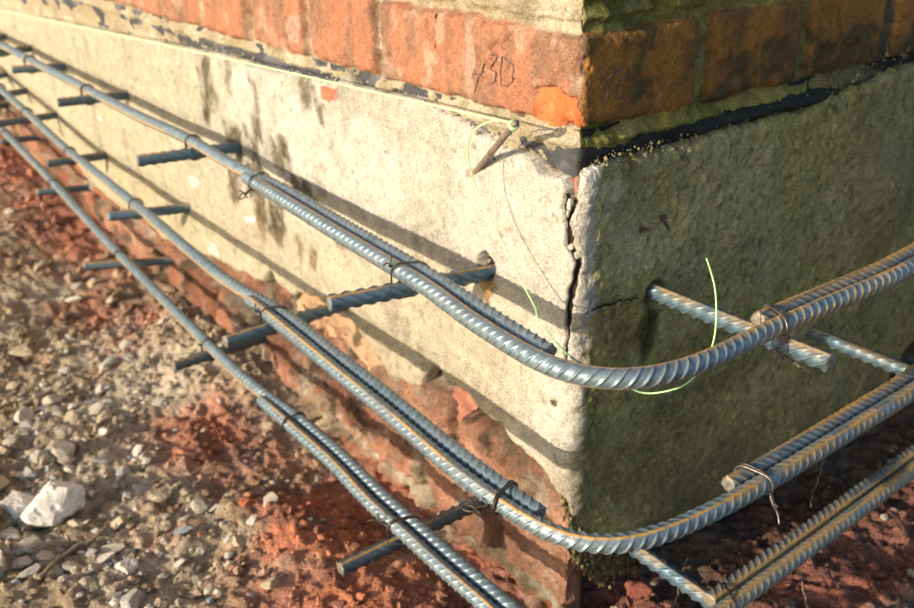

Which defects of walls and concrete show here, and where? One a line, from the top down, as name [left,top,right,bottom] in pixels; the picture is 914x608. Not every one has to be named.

damp [196,57,217,123]
damp [298,77,323,124]
damp [226,113,263,172]
damp [272,136,315,200]
damp [228,170,285,246]
damp [296,236,316,269]
spalling [296,293,325,311]
crack [565,193,636,360]
spalling [310,313,384,371]
damp [638,310,658,360]
spalling [452,386,478,422]